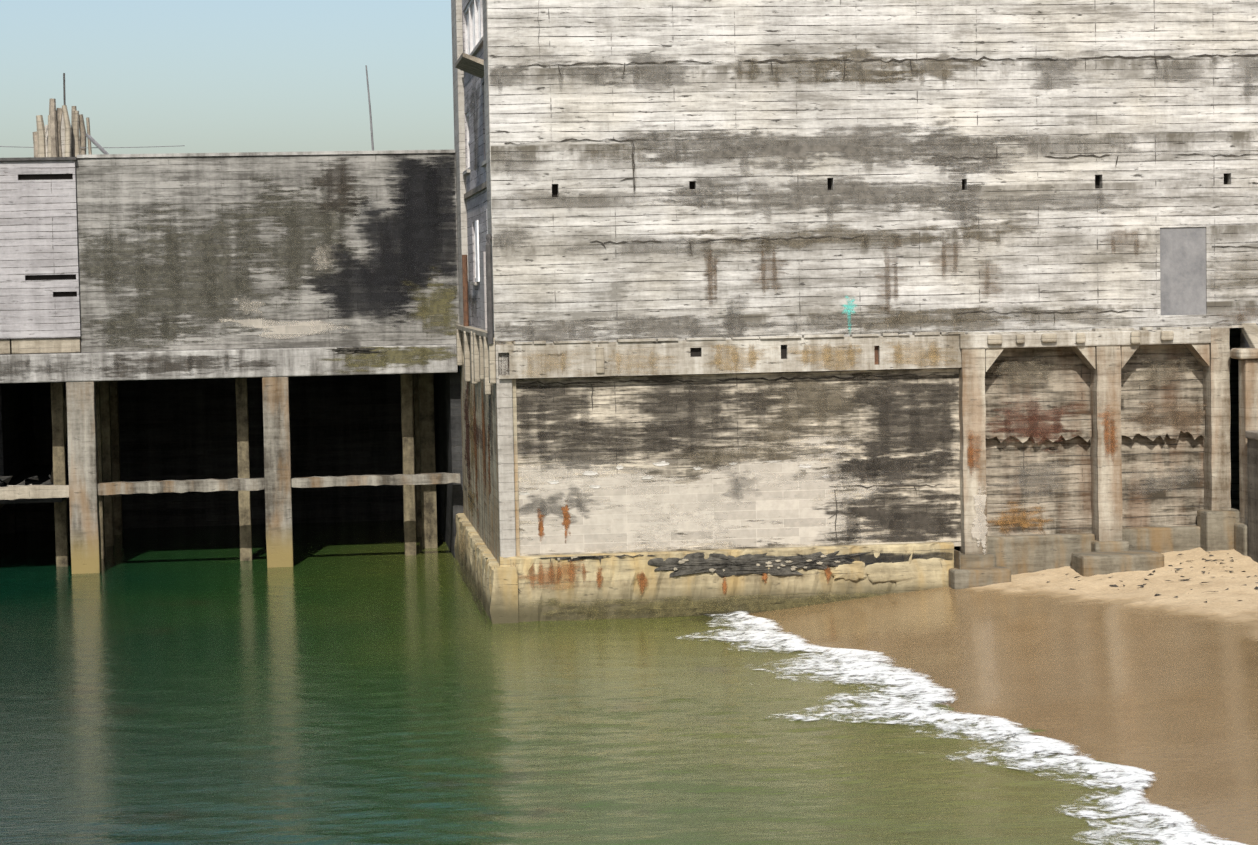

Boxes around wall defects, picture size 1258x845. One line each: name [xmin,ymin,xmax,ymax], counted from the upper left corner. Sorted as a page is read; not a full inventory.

damp [736,49,983,83]
damp [1031,56,1077,89]
damp [79,154,476,377]
corrosion [463,382,491,527]
damp [516,373,961,567]
corrosion [967,435,981,467]
corrosion [988,402,1078,451]
corrosion [561,506,571,543]